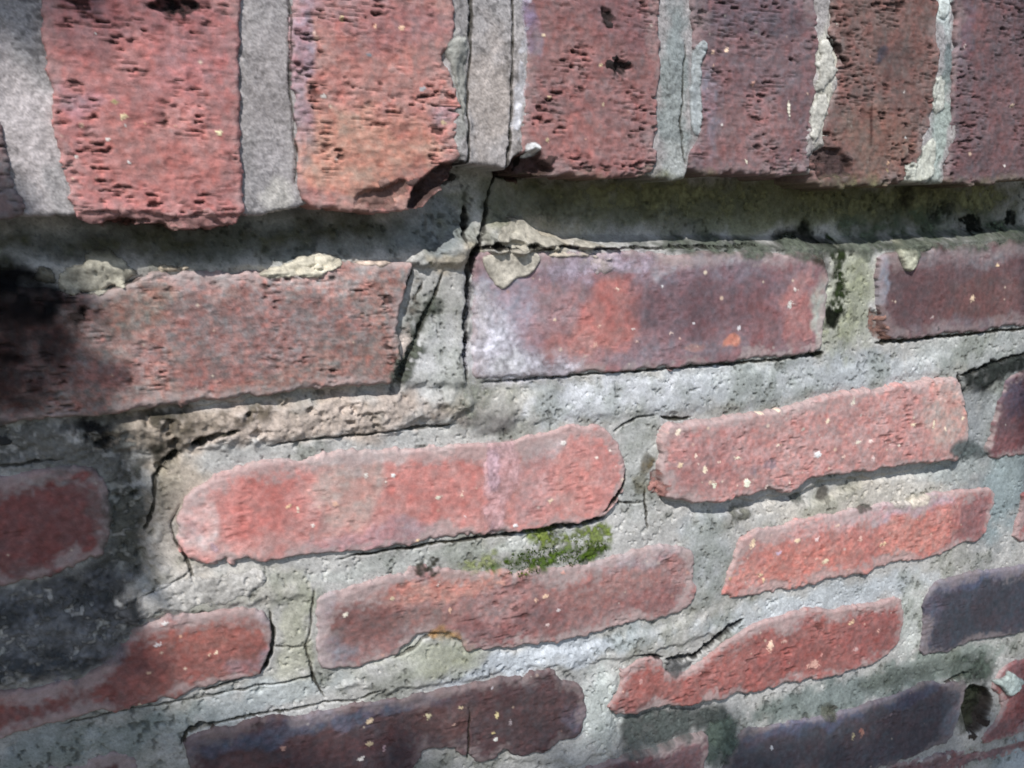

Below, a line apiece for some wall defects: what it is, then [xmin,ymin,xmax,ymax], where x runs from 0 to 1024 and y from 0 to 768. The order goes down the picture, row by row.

crack [398,0,822,383]
crack [144,430,238,580]
crack [278,424,449,444]
crack [639,619,741,660]